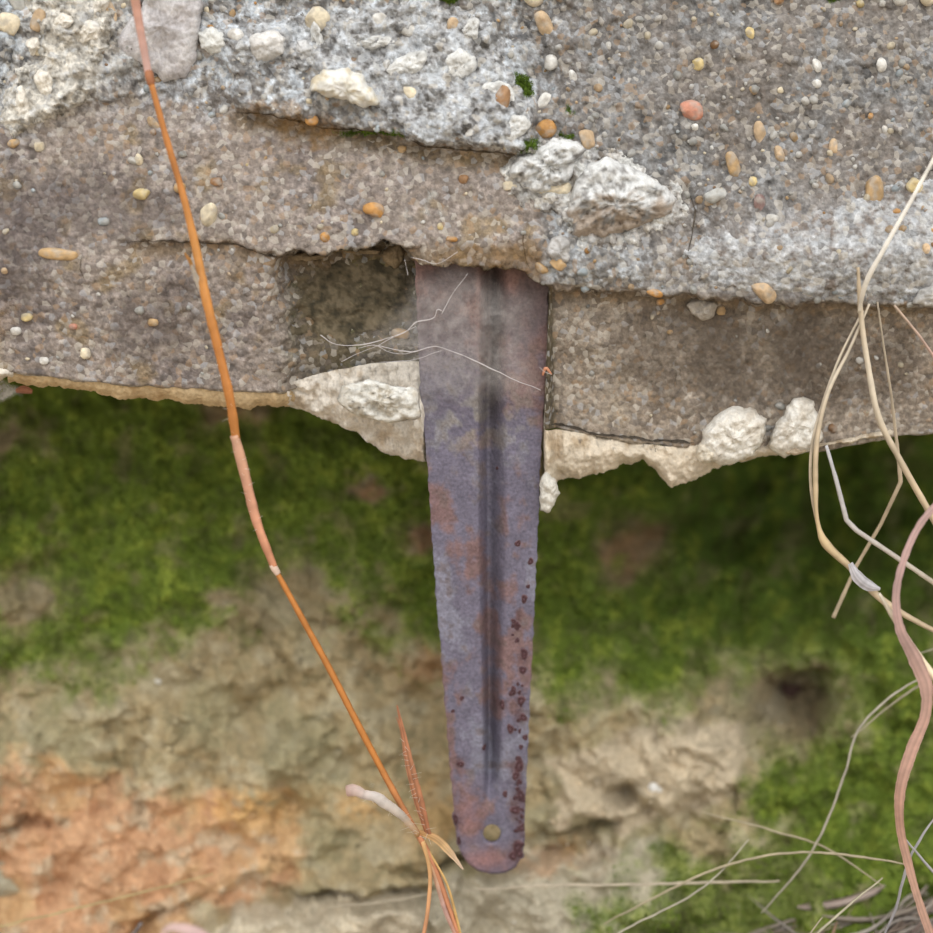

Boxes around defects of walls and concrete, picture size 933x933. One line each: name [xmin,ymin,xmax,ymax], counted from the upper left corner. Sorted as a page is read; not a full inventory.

crack [121,240,296,258]
spalling [288,245,417,358]
crack [551,423,695,452]
rust [499,619,529,861]